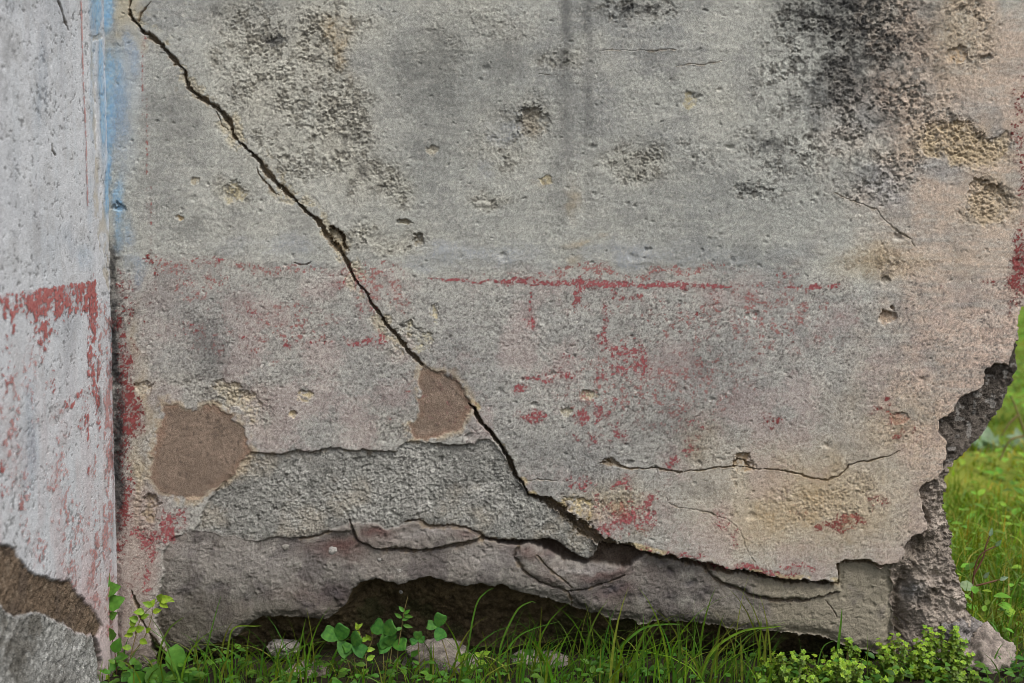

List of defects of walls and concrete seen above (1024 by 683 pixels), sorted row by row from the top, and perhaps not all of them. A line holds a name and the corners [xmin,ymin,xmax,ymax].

leakage [780,0,919,107]
crack [129,0,423,366]
crack [251,448,395,456]
spalling [0,272,660,638]
crack [300,403,901,617]
peeling [418,261,840,469]
peeling [666,551,815,579]
spalling [732,452,758,475]
peeling [814,513,866,534]
spalling [871,397,920,439]
spalling [938,342,1017,469]